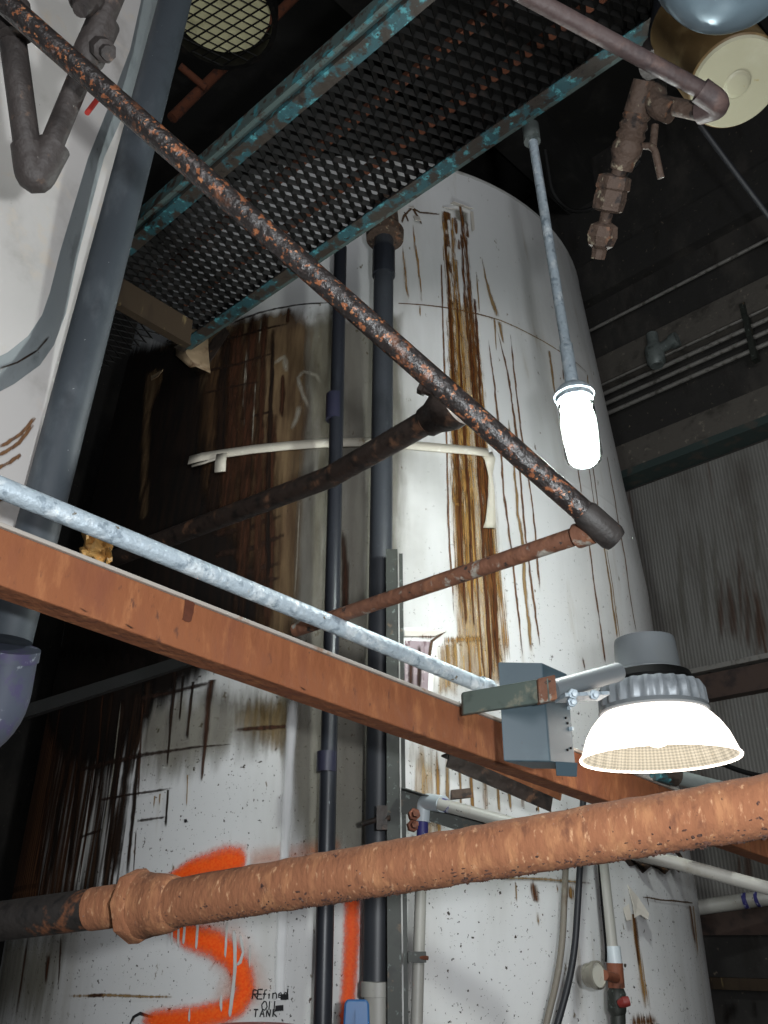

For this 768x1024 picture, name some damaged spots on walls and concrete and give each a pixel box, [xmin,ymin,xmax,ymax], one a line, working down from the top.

water stain [197,302,321,512]
water stain [300,321,332,477]
water stain [343,322,373,456]
corrosion [399,206,564,443]
water stain [295,490,328,611]
water stain [339,637,368,666]
water stain [340,467,371,607]
corrosion [441,558,540,680]
corrosion [446,425,537,569]
water stain [36,671,227,880]
water stain [281,696,322,854]
water stain [335,716,367,850]